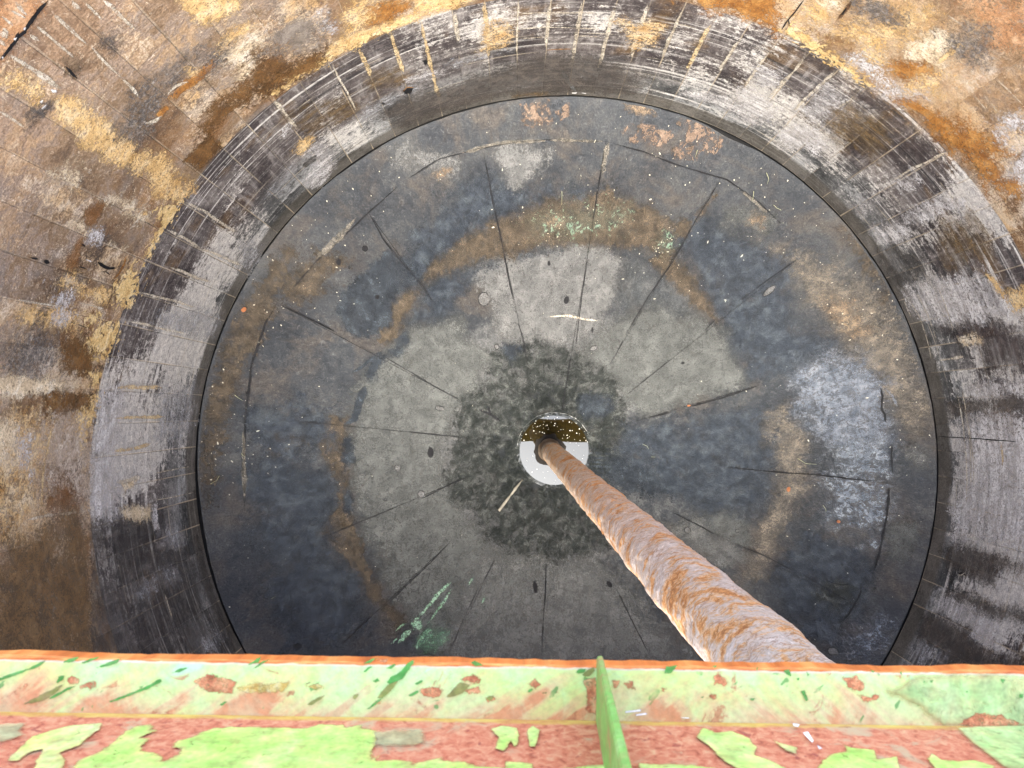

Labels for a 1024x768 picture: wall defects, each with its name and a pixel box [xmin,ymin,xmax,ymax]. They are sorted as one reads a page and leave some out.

rust [145,59,216,124]
rust [182,39,339,171]
rust [828,95,896,167]
rust [880,57,1024,206]
water stain [147,136,1024,709]
crack [880,389,897,422]
crack [674,446,893,622]